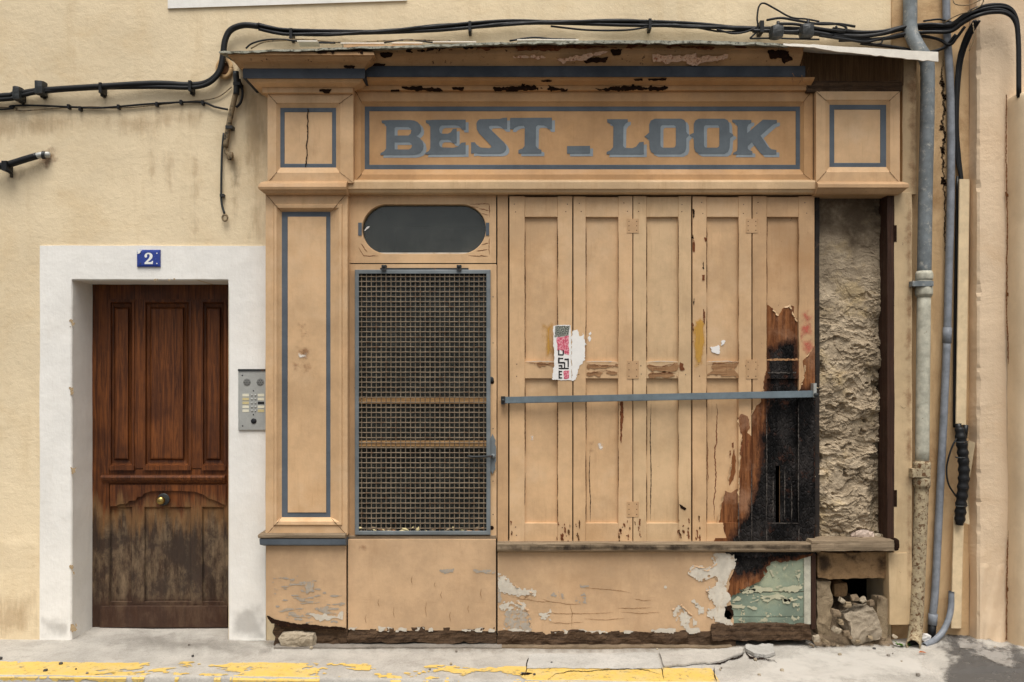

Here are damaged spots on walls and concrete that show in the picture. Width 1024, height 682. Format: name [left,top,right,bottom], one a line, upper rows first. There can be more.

peeling [406,44,747,66]
spalling [767,50,793,64]
spalling [493,80,568,92]
spalling [596,78,668,92]
crack [303,110,311,167]
peeling [586,361,618,377]
peeling [647,361,685,378]
peeling [707,361,739,378]
peeling [707,404,749,523]
peeling [267,576,357,630]
peeling [462,569,608,634]
peeling [651,553,804,634]